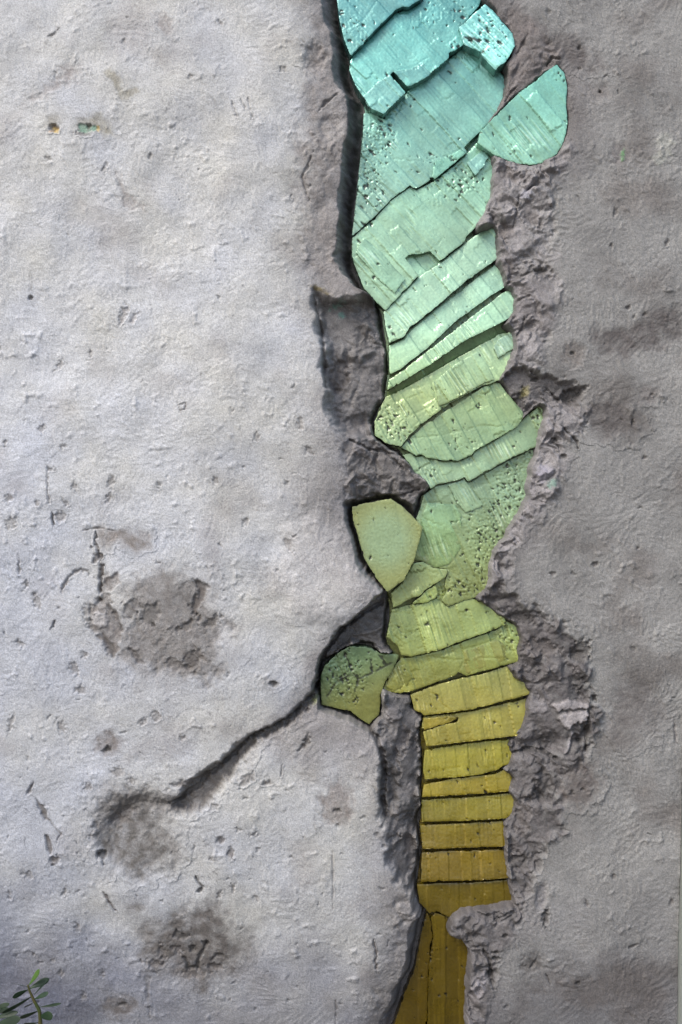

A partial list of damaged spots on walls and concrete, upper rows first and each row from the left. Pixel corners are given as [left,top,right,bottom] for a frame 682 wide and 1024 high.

spalling [488,0,552,123]
spalling [275,0,430,518]
spalling [472,133,603,900]
spalling [311,600,393,688]
crack [103,653,393,822]
leakage [79,778,194,891]
spalling [359,686,423,1024]